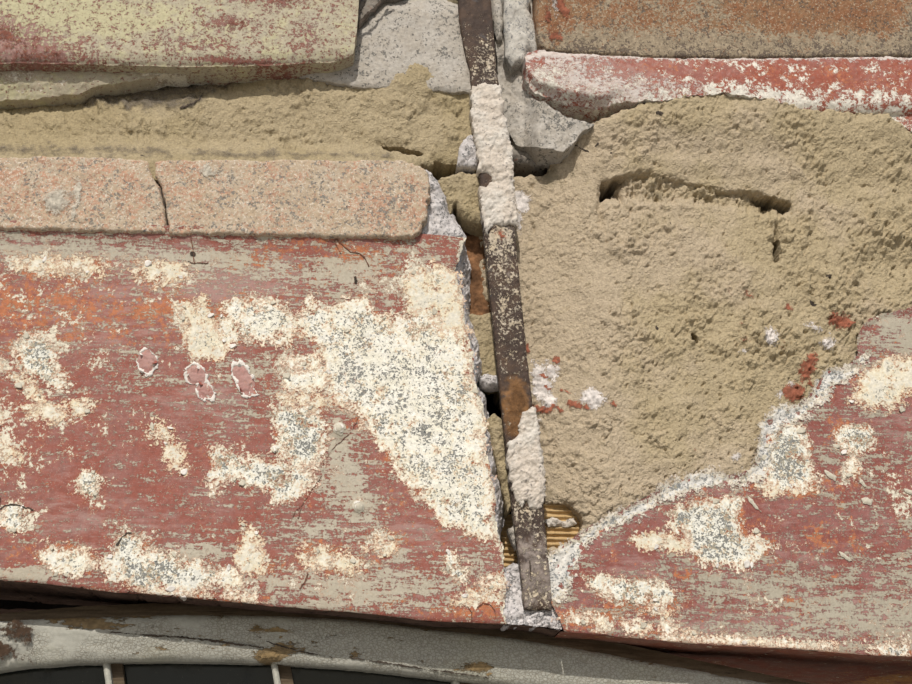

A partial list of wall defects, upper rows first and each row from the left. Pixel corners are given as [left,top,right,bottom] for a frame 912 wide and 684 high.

spalling [455,135,477,174]
peeling [0,243,516,608]
spalling [547,310,912,651]
peeling [855,636,912,656]